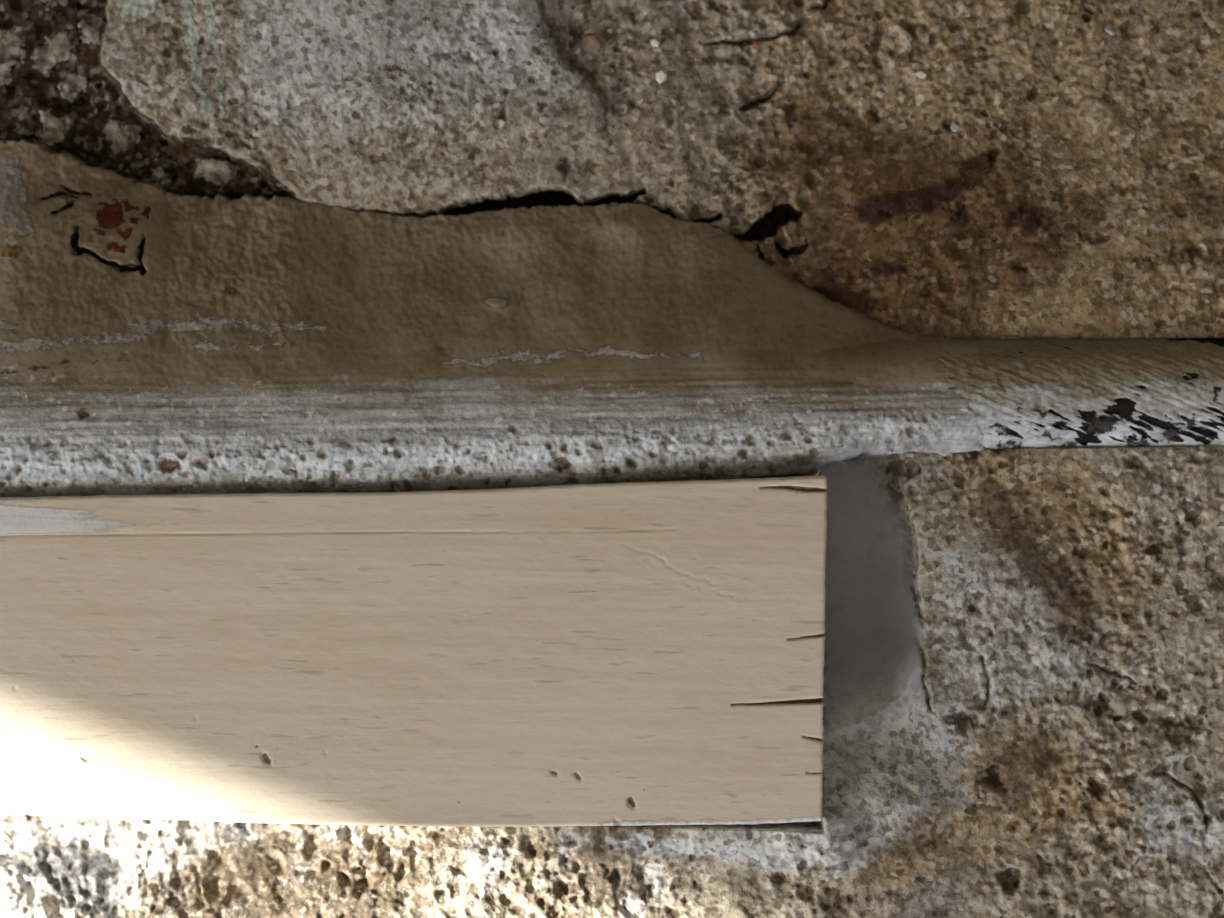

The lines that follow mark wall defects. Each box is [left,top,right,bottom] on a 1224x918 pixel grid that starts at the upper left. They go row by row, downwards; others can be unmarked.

spalling [0,0,296,199]
crack [211,193,273,201]
crack [412,191,809,260]
corrosion [756,119,1099,338]
peeling [989,423,1022,450]
peeling [1032,408,1195,447]